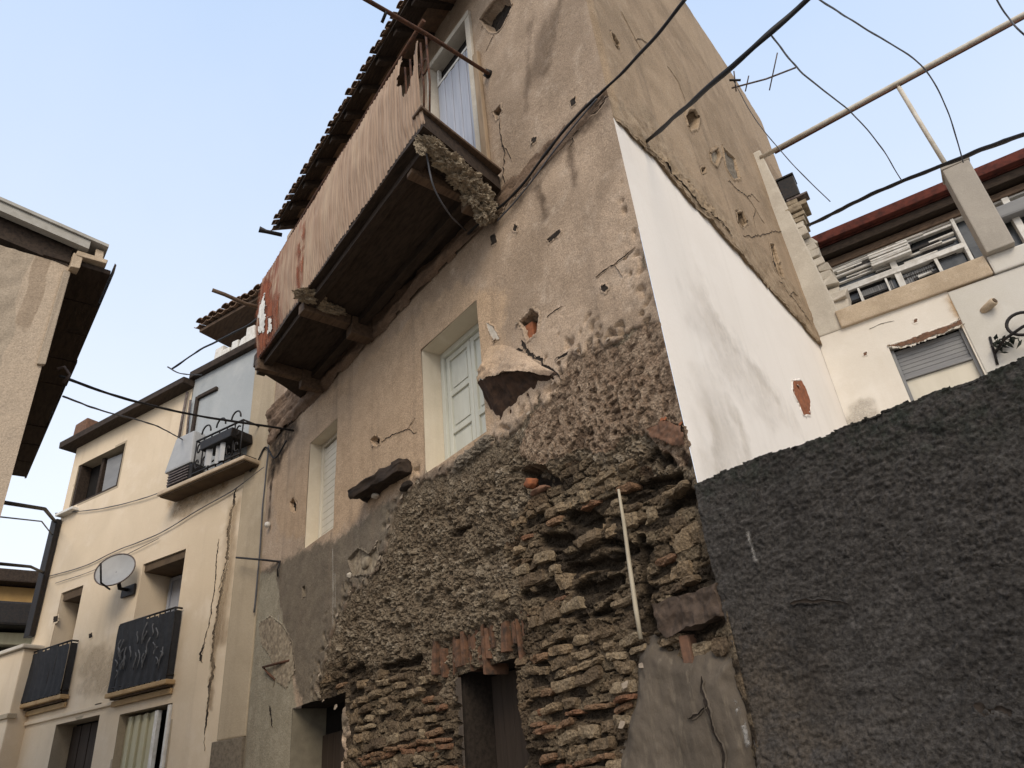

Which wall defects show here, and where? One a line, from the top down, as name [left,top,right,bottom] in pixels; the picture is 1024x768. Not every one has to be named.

spalling [413,134,499,247]
crack [496,118,548,220]
spalling [643,144,749,236]
crack [596,247,635,278]
rust [256,279,279,350]
spalling [887,317,965,349]
crack [381,418,417,443]
peeling [791,378,811,418]
spalling [318,301,758,768]
crack [198,489,237,751]
crack [688,676,727,768]